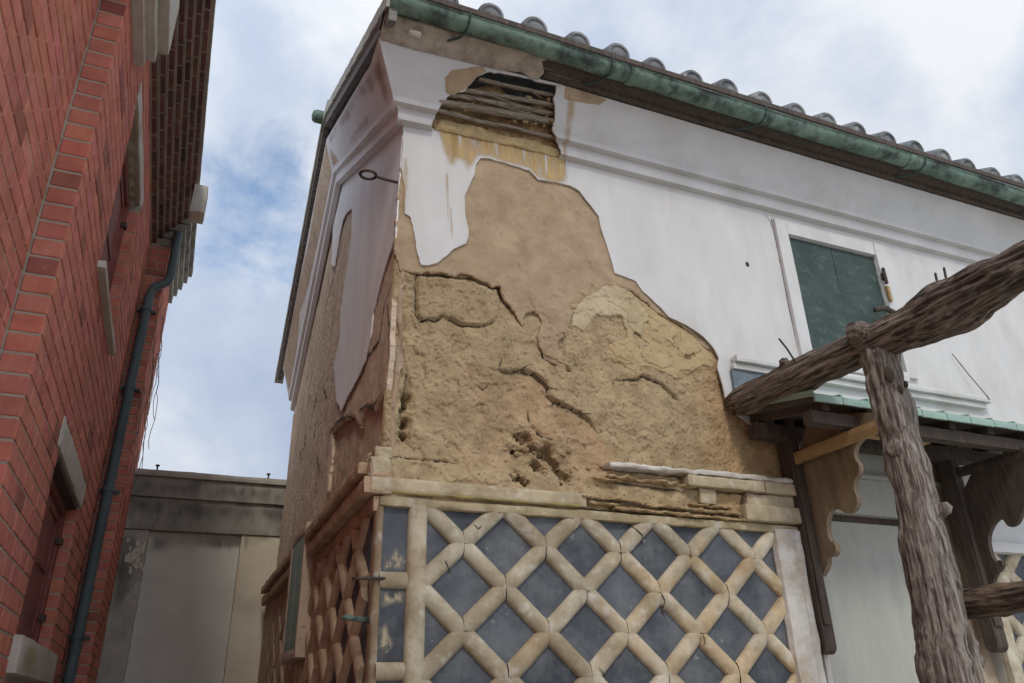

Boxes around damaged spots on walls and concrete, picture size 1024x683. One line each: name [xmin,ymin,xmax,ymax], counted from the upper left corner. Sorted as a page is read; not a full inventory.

spalling [432,67,606,157]
crack [300,274,513,470]
peeling [276,144,784,569]
crack [473,352,592,440]
crack [616,375,673,398]
peeling [124,532,146,588]